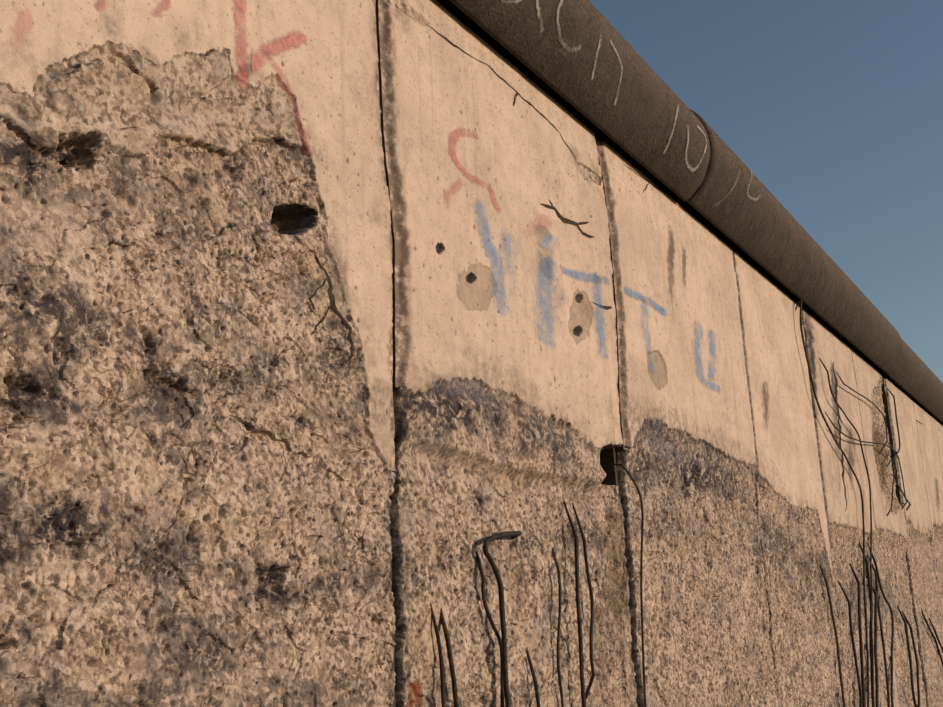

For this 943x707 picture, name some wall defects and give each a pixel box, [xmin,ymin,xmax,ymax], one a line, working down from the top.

peeling [16,40,305,159]
crack [426,23,576,159]
spalling [577,161,602,186]
spalling [0,81,396,707]
spalling [393,376,623,461]
spalling [389,417,943,707]